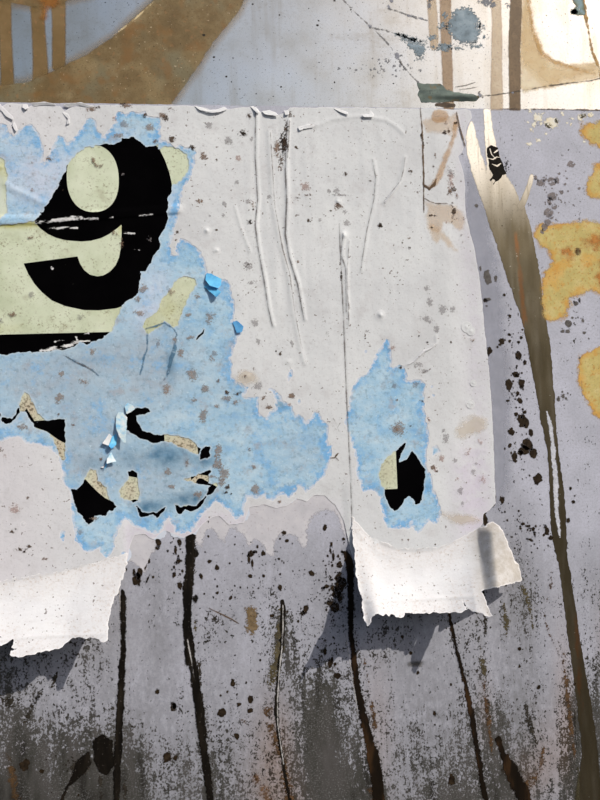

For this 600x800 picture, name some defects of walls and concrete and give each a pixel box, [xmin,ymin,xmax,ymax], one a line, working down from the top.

peeling [338,0,510,78]
peeling [417,83,479,108]
rust [579,120,600,148]
rust [587,163,600,198]
rust [534,220,600,321]
rust [578,347,600,418]
peeling [466,109,600,800]
water stain [60,589,127,800]
water stain [182,534,214,800]
water stain [341,550,385,800]
water stain [448,613,489,800]
water stain [495,736,532,800]